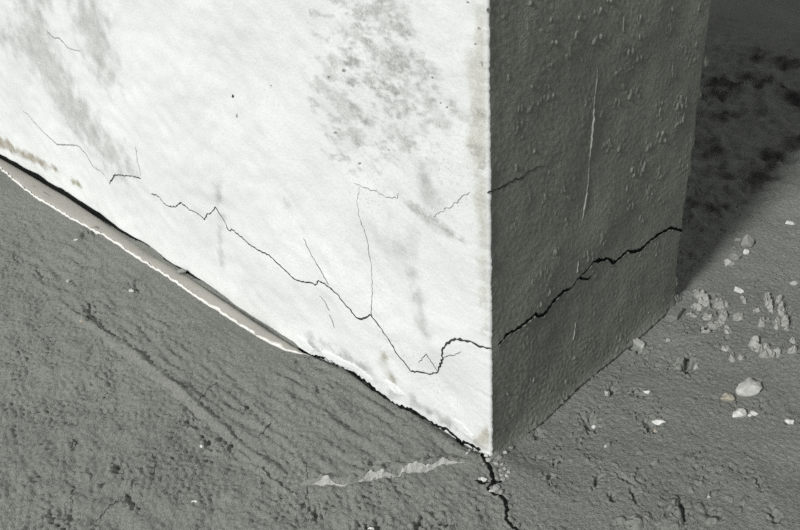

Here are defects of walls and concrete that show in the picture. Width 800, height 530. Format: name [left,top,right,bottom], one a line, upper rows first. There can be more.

spalling [75,226,102,242]
crack [23,111,682,375]
spalling [313,457,464,487]
crack [309,353,521,530]